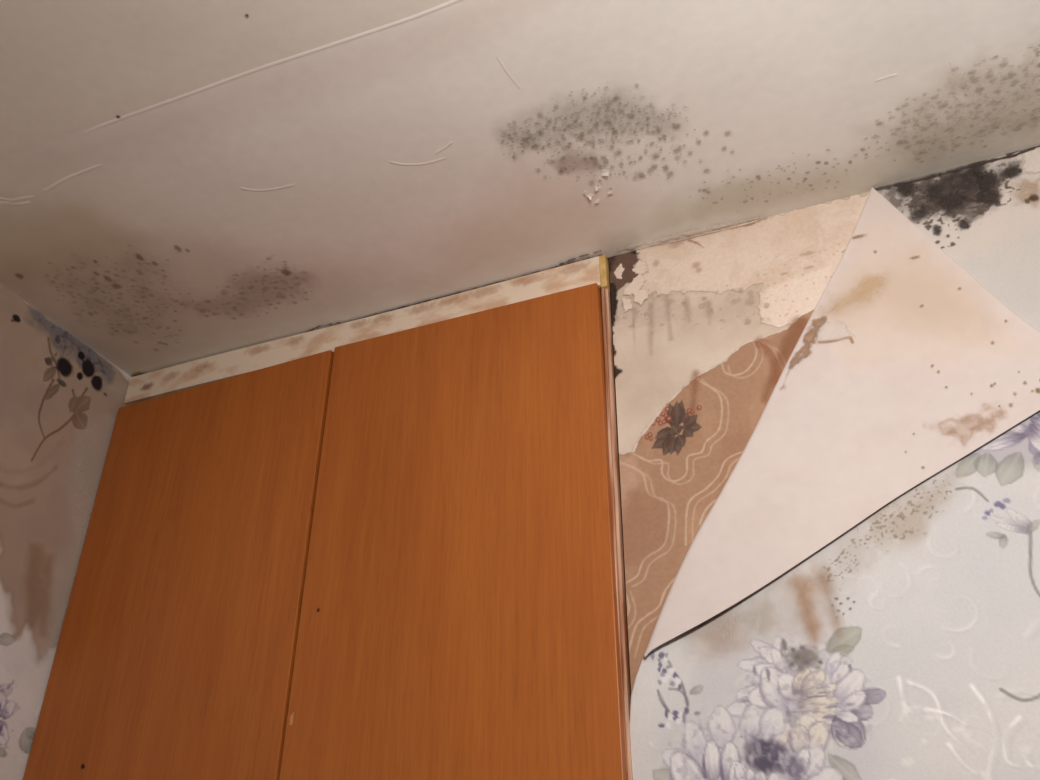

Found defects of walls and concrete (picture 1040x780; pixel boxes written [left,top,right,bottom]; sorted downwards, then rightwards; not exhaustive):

damp [501,97,691,179]
damp [877,160,1038,248]
peeling [614,192,870,328]